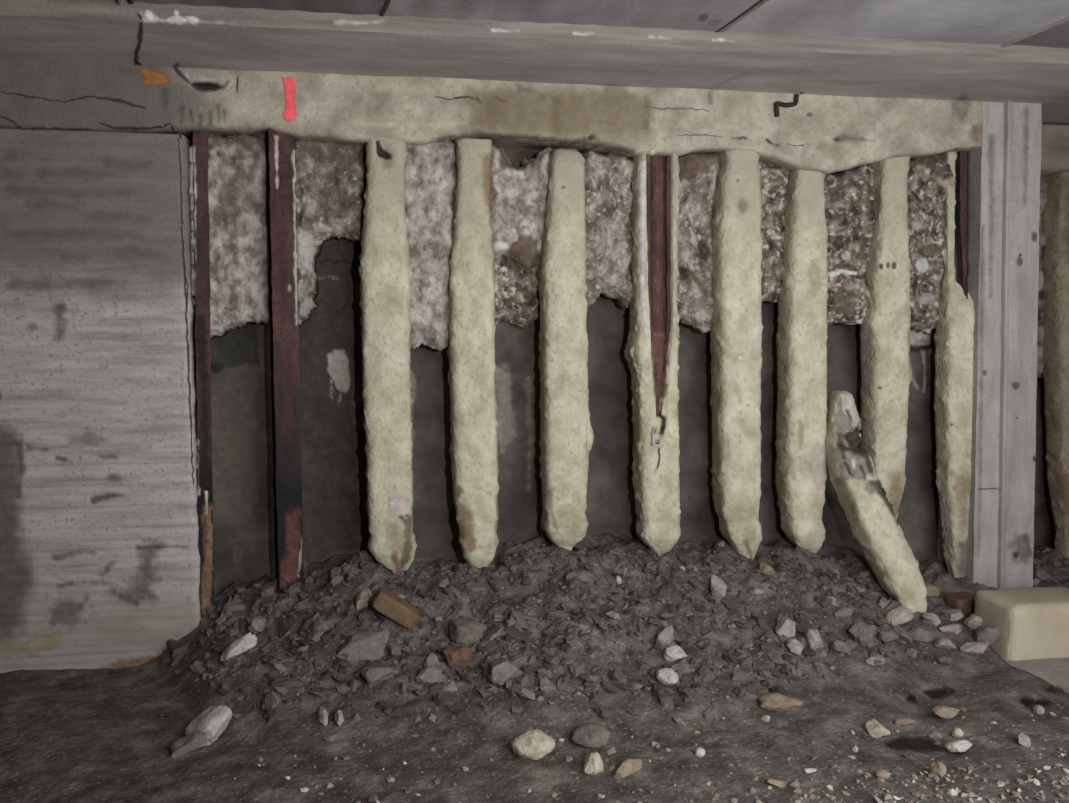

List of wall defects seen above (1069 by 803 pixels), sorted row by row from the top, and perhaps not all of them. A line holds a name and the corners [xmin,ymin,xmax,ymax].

crack [0,90,194,485]
rust [189,147,197,302]
spalling [208,133,278,337]
spalling [289,139,391,325]
spalling [490,144,553,328]
spalling [578,136,655,343]
spalling [674,152,720,333]
spalling [824,164,896,325]
spalling [907,153,957,351]
rust [651,332,668,431]
rust [197,489,213,615]
rust [280,510,301,586]